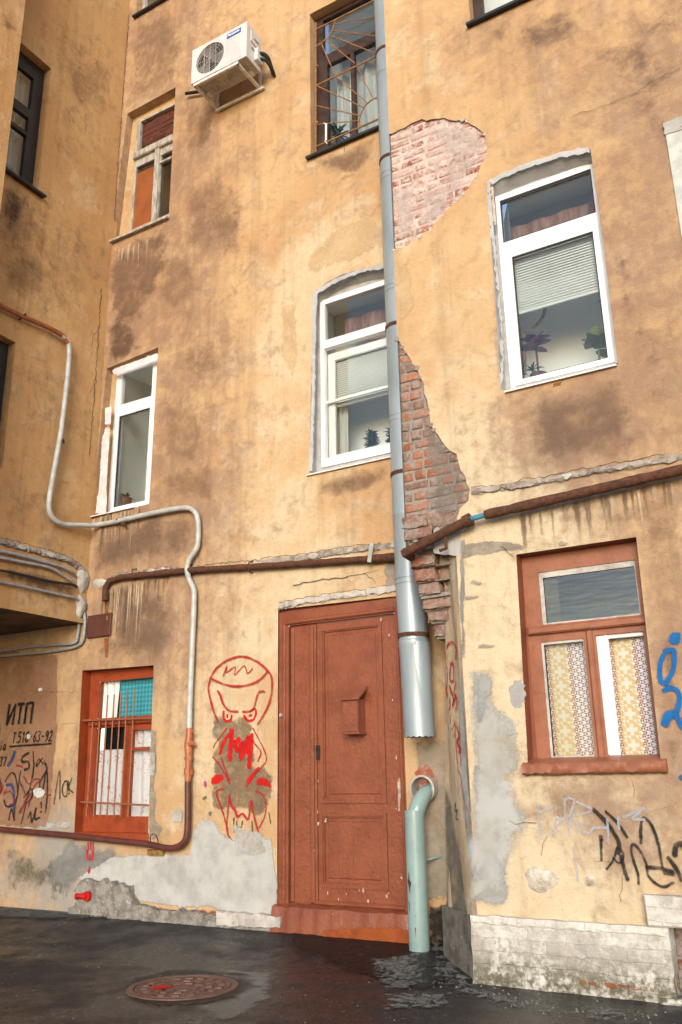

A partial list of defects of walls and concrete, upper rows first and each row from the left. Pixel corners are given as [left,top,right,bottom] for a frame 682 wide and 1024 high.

flaking render [390,117,487,313]
leakage [111,236,162,358]
crack [89,288,102,455]
leakage [601,490,642,516]
crack [293,570,378,586]
leakage [102,579,164,650]
flaking render [261,336,682,899]
leakage [13,859,55,889]
flaking render [68,878,282,931]